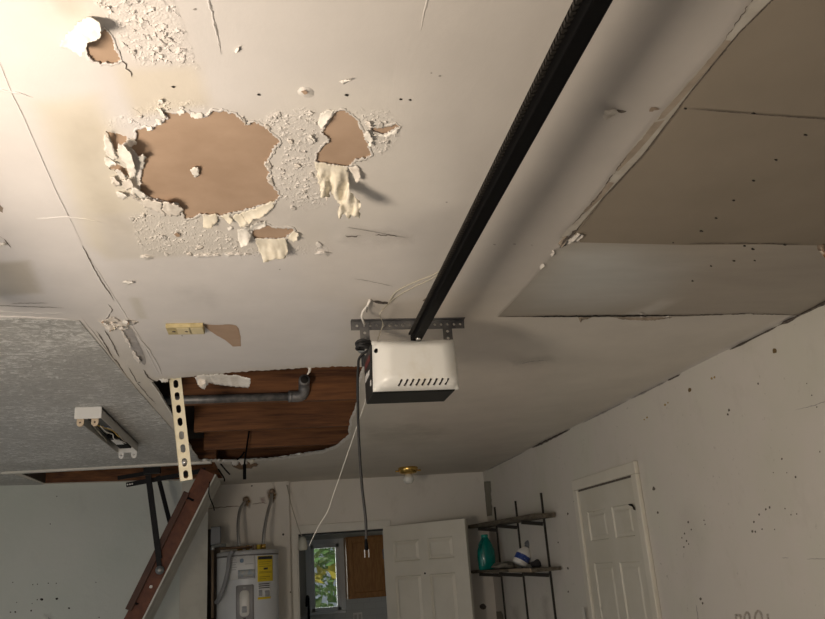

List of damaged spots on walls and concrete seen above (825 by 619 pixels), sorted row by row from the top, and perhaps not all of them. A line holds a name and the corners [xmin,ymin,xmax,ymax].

peeling [60,0,201,72]
crack [207,0,221,53]
peeling [94,97,403,263]
crack [0,65,157,404]
peeling [203,324,241,347]